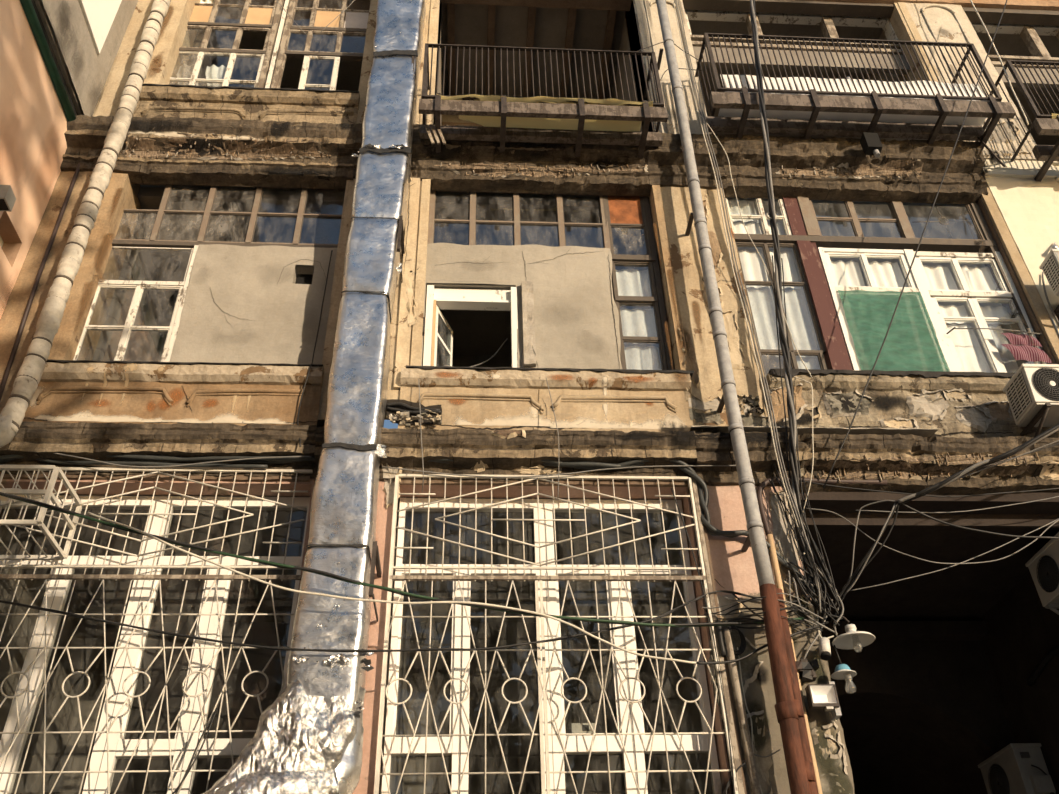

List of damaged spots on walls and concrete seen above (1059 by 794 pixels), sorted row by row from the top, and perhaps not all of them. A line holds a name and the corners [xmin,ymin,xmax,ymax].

spalling [122,132,333,161]
spalling [434,162,648,178]
spalling [775,157,924,179]
spalling [703,284,745,369]
spalling [678,321,724,425]
spalling [386,399,442,428]
spalling [737,383,874,427]
spalling [880,388,1013,432]
spalling [382,464,402,510]
spalling [511,465,562,475]
spalling [800,453,1059,482]
spalling [811,722,848,794]